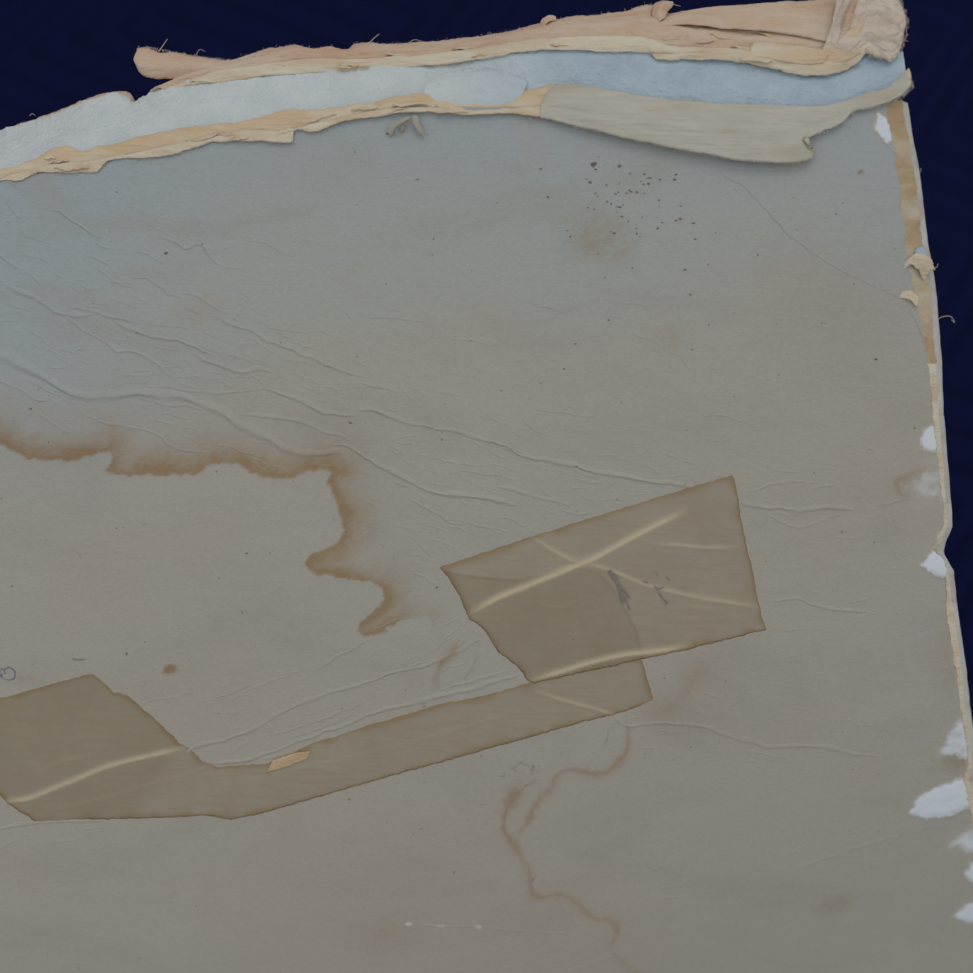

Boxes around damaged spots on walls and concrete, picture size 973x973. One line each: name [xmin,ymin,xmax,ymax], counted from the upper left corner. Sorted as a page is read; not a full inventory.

peeling [134,47,233,79]
spalling [871,110,892,146]
water stain [0,339,318,482]
spalling [905,423,944,513]
water stain [302,479,501,689]
spalling [917,546,947,581]
water stain [474,633,757,973]
spalling [905,714,973,926]